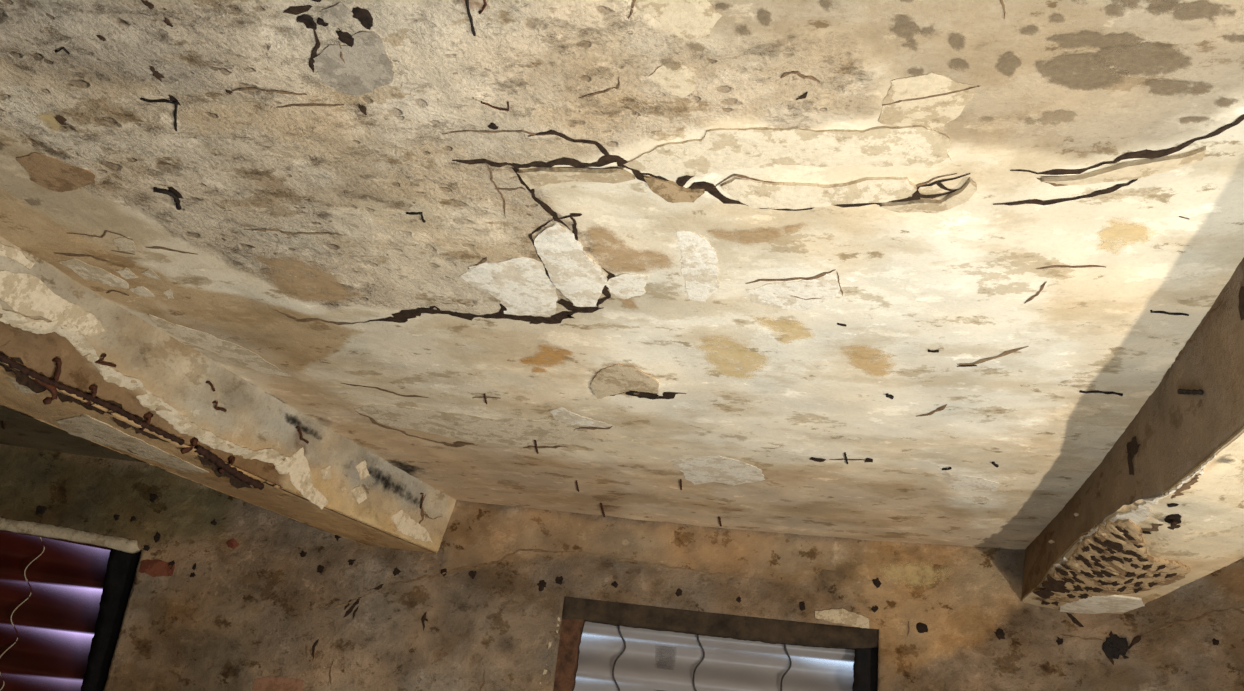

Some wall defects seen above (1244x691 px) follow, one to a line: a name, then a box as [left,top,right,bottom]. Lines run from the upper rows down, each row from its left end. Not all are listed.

crack [231,88,344,108]
peeling [17,148,95,206]
crack [442,72,1244,282]
crack [244,228,343,236]
flaking render [459,222,648,316]
crack [746,270,843,300]
crack [1024,266,1106,304]
crack [278,304,603,325]
flaking render [0,244,332,510]
spalling [590,364,686,400]
flaking render [391,510,433,543]
spalling [1032,453,1216,614]